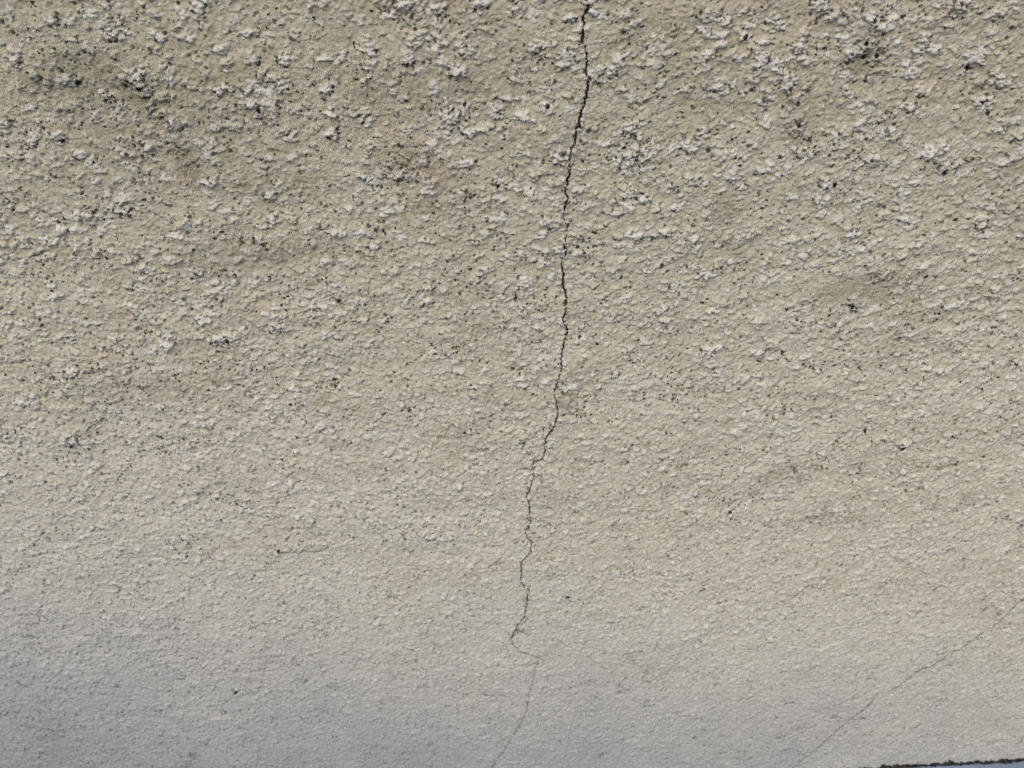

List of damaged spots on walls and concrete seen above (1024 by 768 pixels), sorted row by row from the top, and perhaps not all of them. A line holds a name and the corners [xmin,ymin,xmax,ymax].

crack [475,0,592,767]